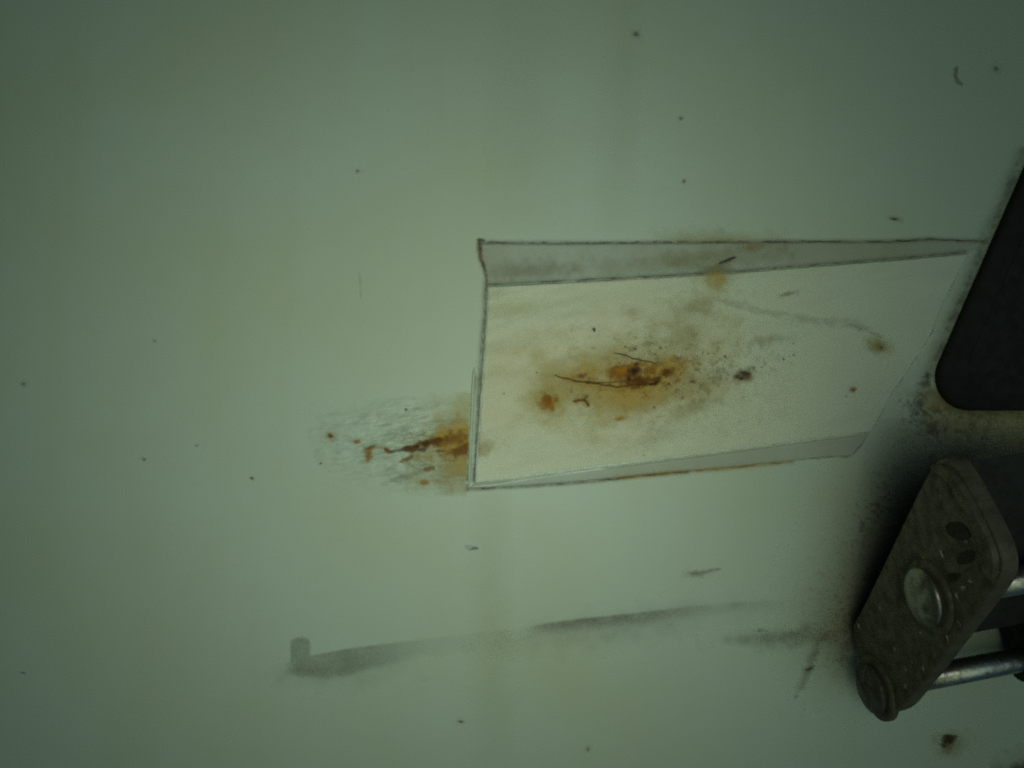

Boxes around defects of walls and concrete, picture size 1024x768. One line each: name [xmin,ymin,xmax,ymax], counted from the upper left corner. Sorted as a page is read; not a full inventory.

rust [354,283,741,485]